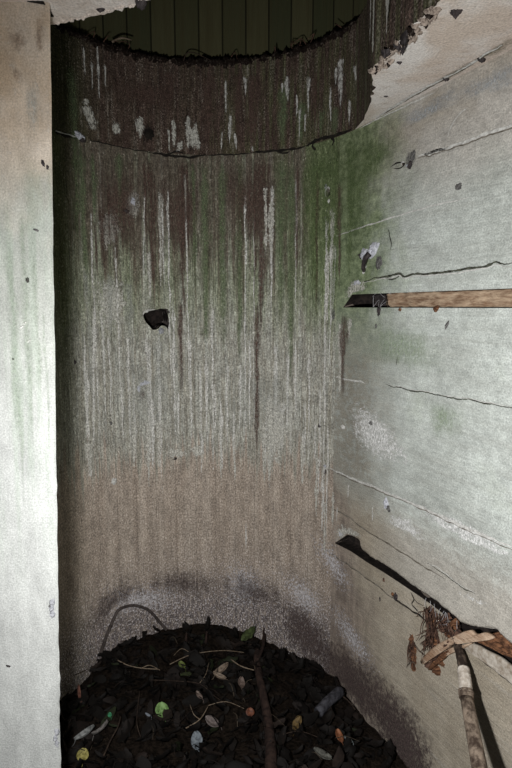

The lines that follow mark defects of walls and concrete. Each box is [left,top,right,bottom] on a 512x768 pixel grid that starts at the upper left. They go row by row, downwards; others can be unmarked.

damp [83,47,106,98]
spalling [50,0,463,155]
crack [55,129,351,159]
crack [364,261,512,283]
spalling [143,309,170,334]
damp [69,59,353,591]
crack [387,383,512,408]
crack [428,563,473,593]
damp [97,573,206,628]
crack [397,593,425,620]
damp [282,574,433,768]